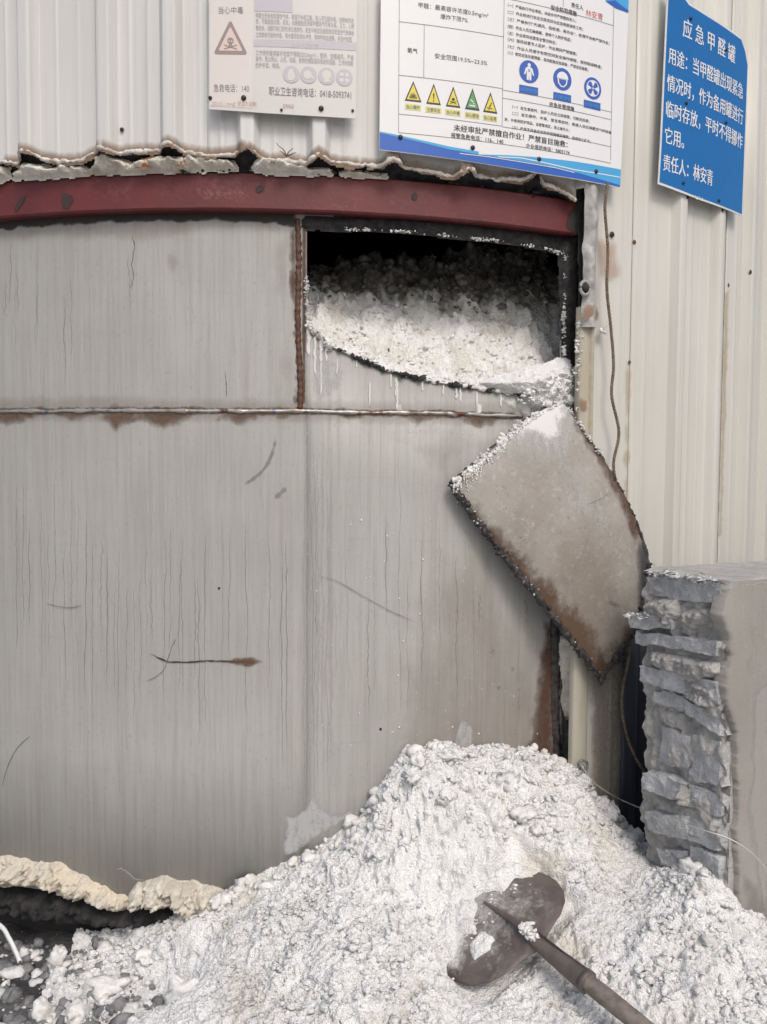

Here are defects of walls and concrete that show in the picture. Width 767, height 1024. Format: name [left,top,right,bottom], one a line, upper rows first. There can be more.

water stain [306,327,339,393]
water stain [0,413,32,422]
water stain [105,412,187,426]
water stain [228,413,255,422]
water stain [390,375,429,420]
crack [150,640,258,680]
rust [530,627,553,755]